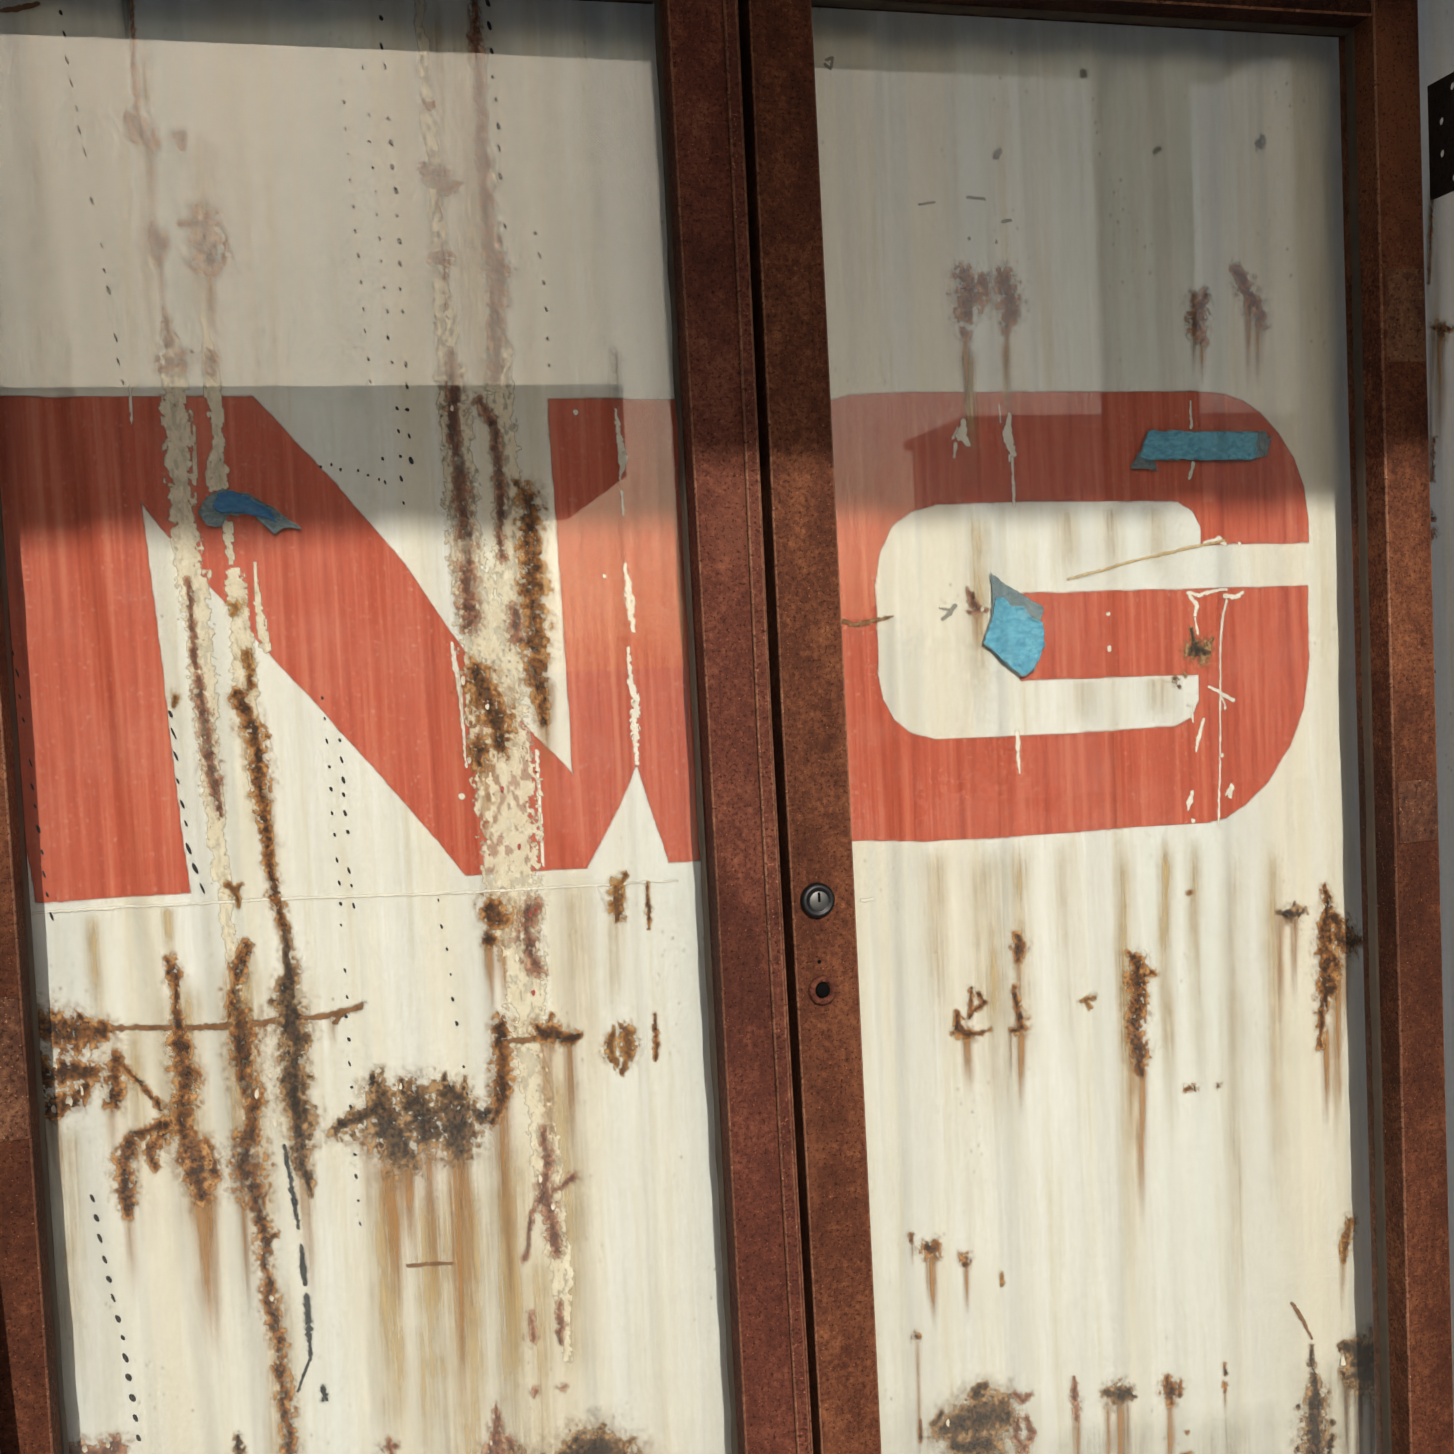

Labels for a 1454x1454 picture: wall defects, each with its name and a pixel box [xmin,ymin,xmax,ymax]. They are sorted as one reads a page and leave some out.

rust [947,262,1021,392]
rust [418,0,553,792]
rust [37,576,583,1454]
rust [950,984,1029,1085]
rust [1123,949,1157,1170]
rust [1276,882,1363,1097]
rust [482,1403,643,1454]
rust [918,1380,1037,1454]
rust [1070,1376,1081,1454]
rust [1100,1379,1138,1454]
rust [1159,1374,1192,1454]
rust [1294,1327,1375,1454]